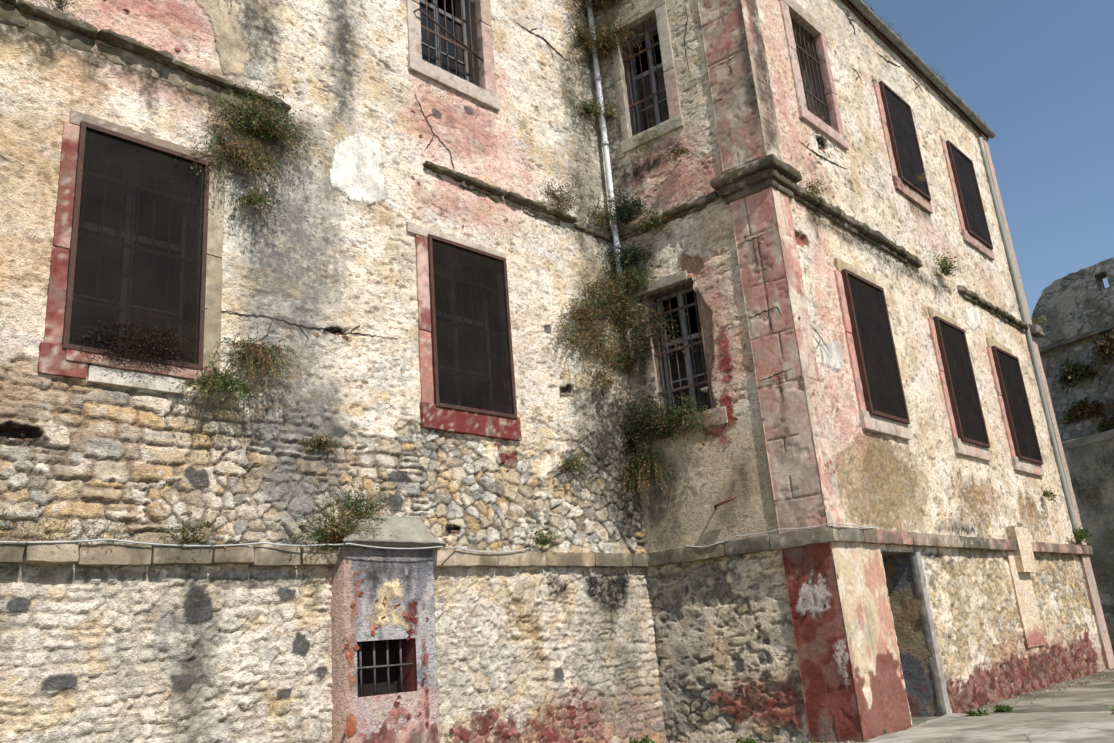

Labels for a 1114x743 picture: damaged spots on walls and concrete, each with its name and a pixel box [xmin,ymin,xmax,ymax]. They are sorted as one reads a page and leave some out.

crack [516,22,576,66]
crack [415,94,454,168]
crack [205,308,399,341]
spalling [680,252,738,493]
peeling [793,571,832,618]
peeling [344,571,429,731]
peeling [833,638,852,688]
peeling [946,629,1098,713]
peeling [344,712,356,738]
peeling [442,688,605,743]
peeling [707,680,805,730]